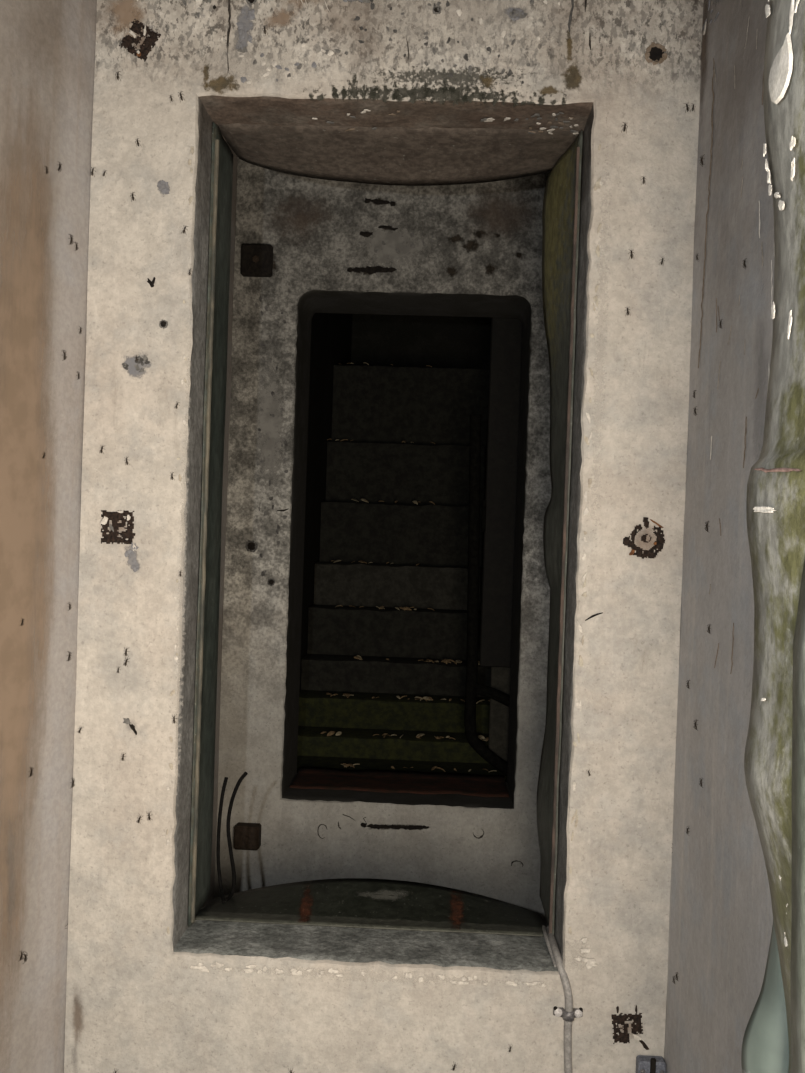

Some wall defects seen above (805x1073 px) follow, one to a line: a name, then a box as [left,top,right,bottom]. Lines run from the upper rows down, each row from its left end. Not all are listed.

peeling [236,0,317,84]
peeling [428,1,483,25]
peeling [423,32,524,85]
peeling [768,0,800,104]
peeling [763,143,785,211]
rust [623,517,665,559]